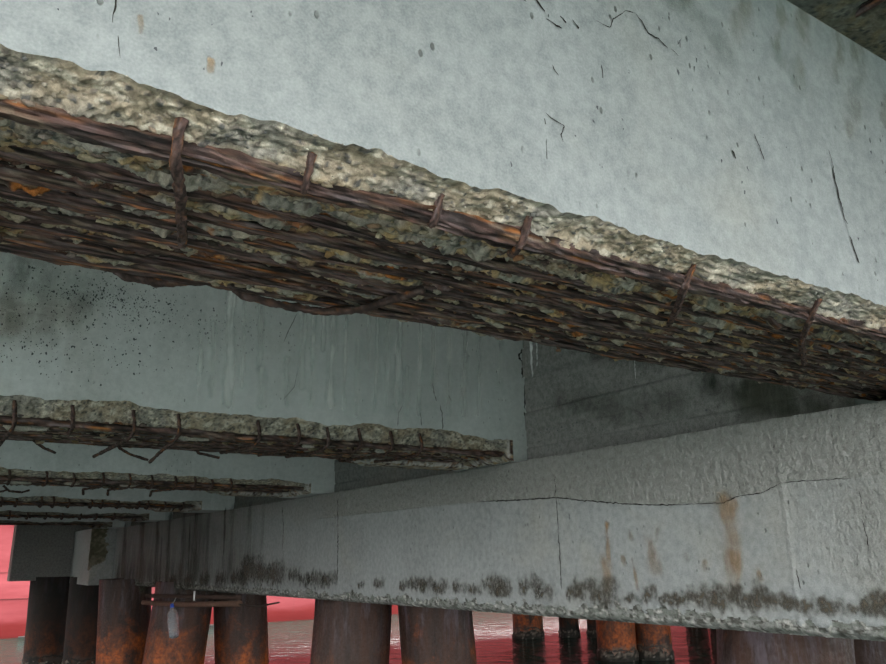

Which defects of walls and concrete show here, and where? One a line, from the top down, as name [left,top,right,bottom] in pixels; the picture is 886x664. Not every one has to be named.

crack [112,0,120,54]
crack [524,0,677,54]
spalling [787,0,886,61]
spalling [0,43,886,402]
spalling [0,395,514,471]
spalling [0,467,311,571]
crack [477,478,842,589]